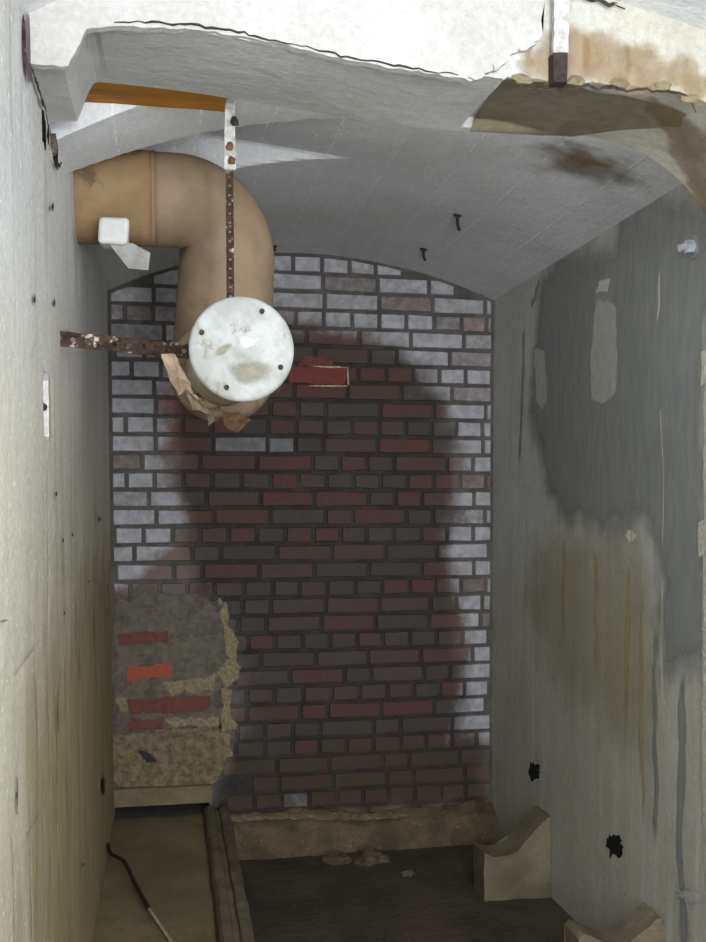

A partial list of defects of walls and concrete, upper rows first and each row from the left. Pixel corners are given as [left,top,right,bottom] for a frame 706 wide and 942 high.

crack [587,0,625,10]
damp [471,79,686,137]
damp [519,197,706,828]
spalling [139,751,156,763]
flaking render [115,598,241,759]
damp [676,684,687,942]